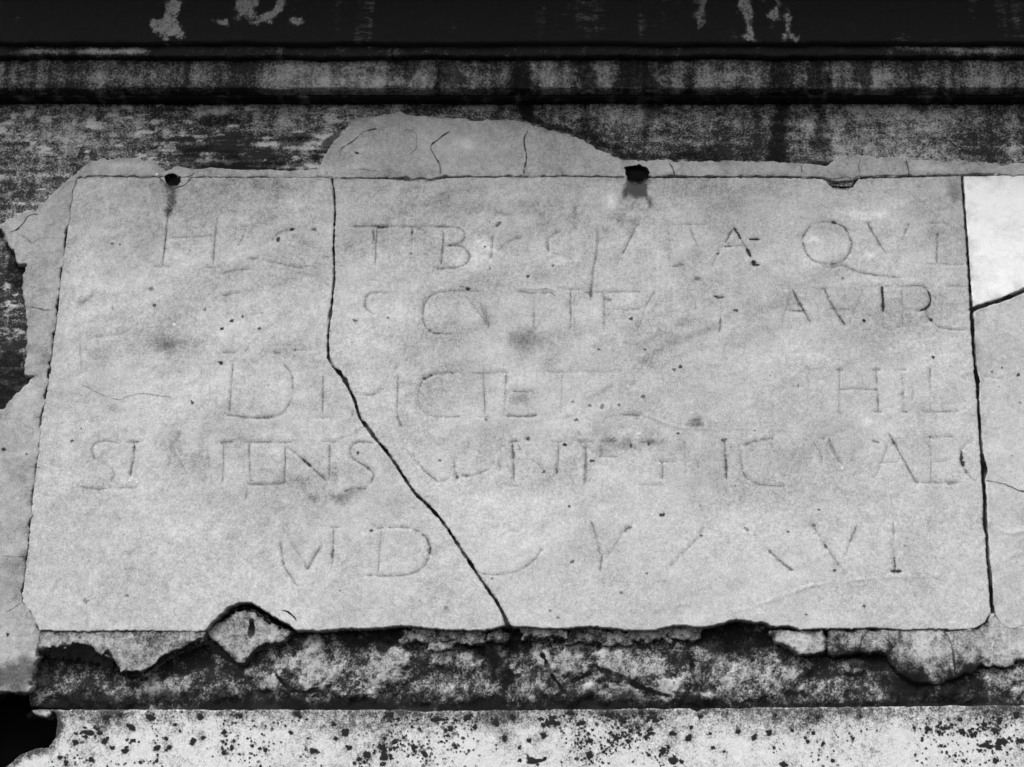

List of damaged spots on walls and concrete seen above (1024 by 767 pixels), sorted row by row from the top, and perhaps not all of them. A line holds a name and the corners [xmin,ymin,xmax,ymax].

damp [390,59,466,94]
damp [504,65,536,122]
damp [765,59,795,162]
damp [806,60,832,153]
damp [622,180,652,206]
crack [327,131,516,685]
spalling [207,606,296,666]
peeling [399,626,703,653]
peeling [781,688,987,708]